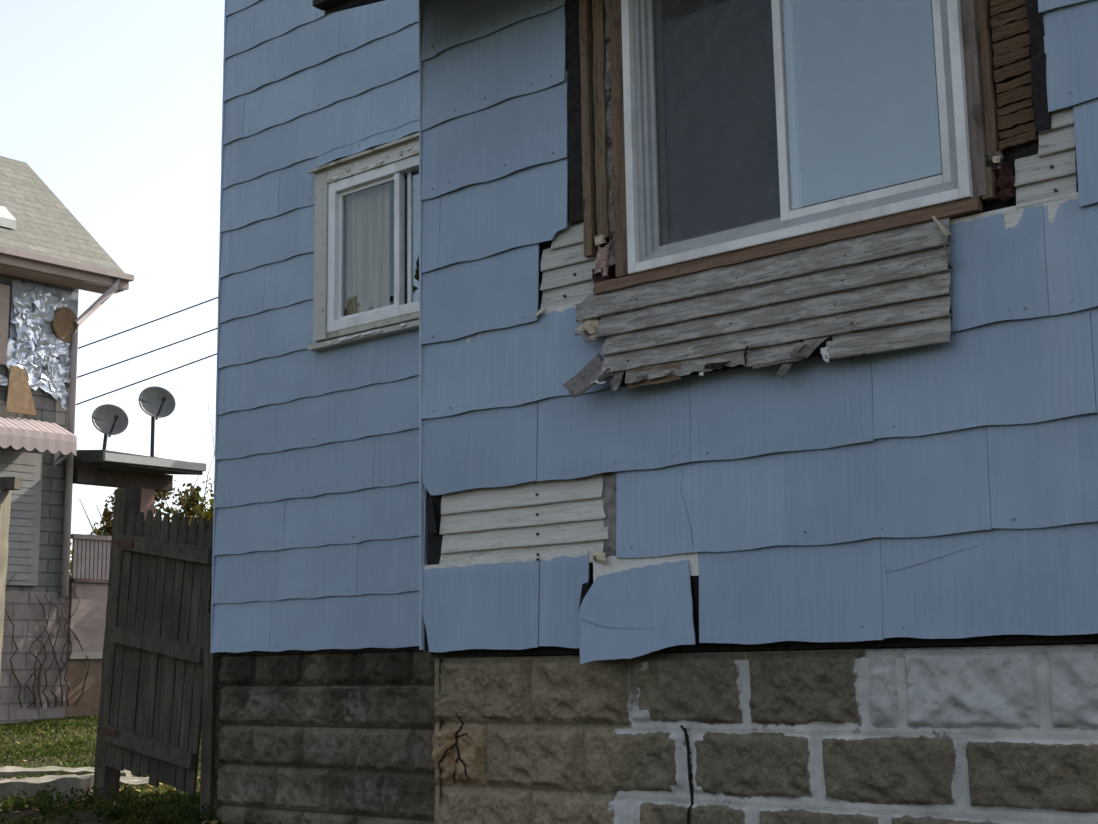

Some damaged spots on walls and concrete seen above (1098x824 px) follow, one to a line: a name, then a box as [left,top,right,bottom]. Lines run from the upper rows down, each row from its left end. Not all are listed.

peeling [7,287,78,396]
crack [438,711,472,783]
crack [680,725,694,824]